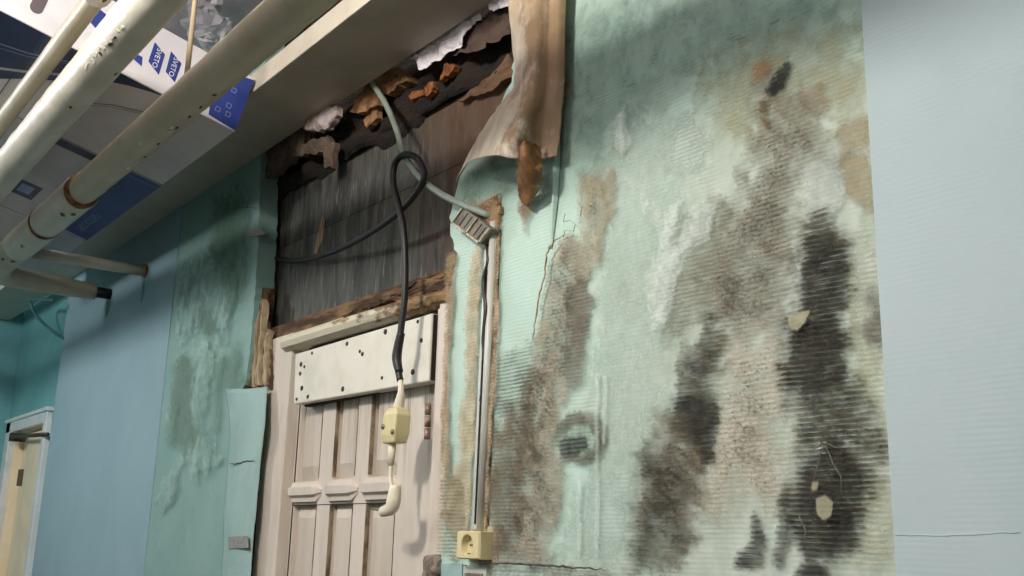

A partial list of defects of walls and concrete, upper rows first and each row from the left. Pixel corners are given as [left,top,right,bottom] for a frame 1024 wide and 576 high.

flaking render [265,104,343,179]
corrosion [28,208,60,240]
corrosion [63,173,101,209]
water stain [487,0,892,576]
water stain [156,186,247,509]